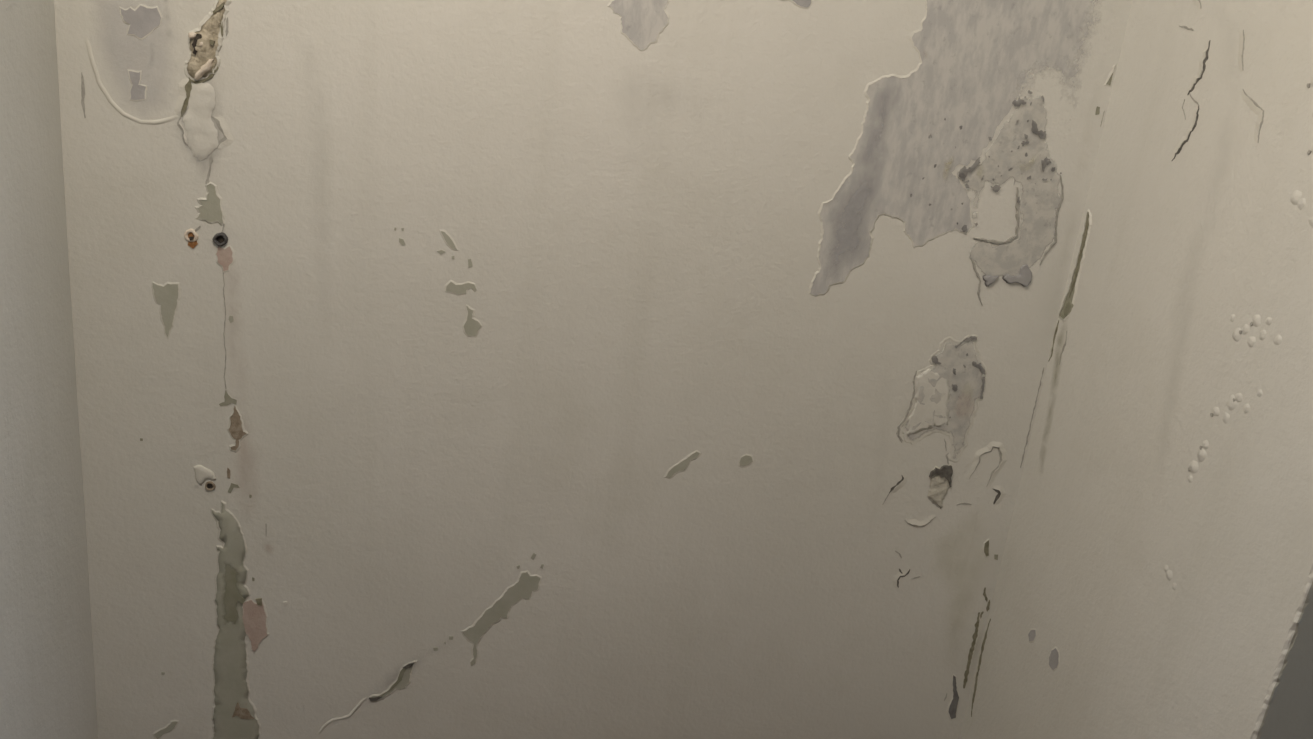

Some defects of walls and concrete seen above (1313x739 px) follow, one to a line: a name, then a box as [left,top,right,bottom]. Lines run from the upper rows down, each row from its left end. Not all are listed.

flaking render [184,0,232,84]
peeling [607,0,670,51]
crack [1171,0,1264,161]
peeling [808,0,1093,304]
peeling [151,282,181,339]
peeling [437,230,482,337]
peeling [1058,209,1092,322]
peeling [219,390,249,453]
peeling [897,335,987,509]
peeling [207,467,269,739]
peeling [433,553,544,666]
peeling [368,660,418,702]